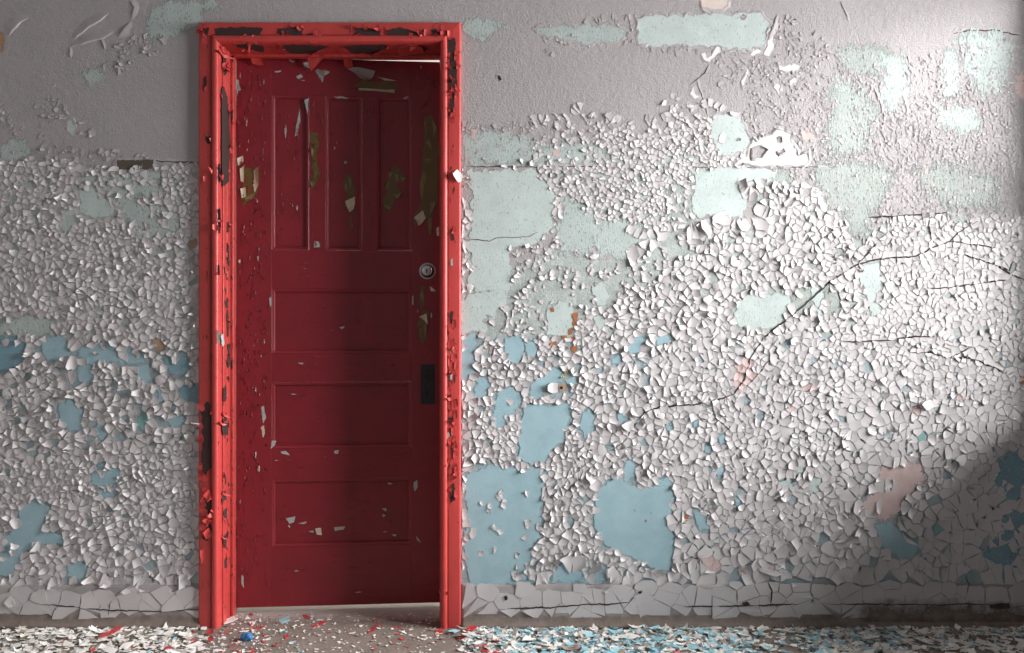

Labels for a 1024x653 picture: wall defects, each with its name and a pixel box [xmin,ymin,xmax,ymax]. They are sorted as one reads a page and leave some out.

peeling [0,0,264,623]
peeling [261,406,290,461]
peeling [275,0,1024,619]
crack [613,212,1023,450]